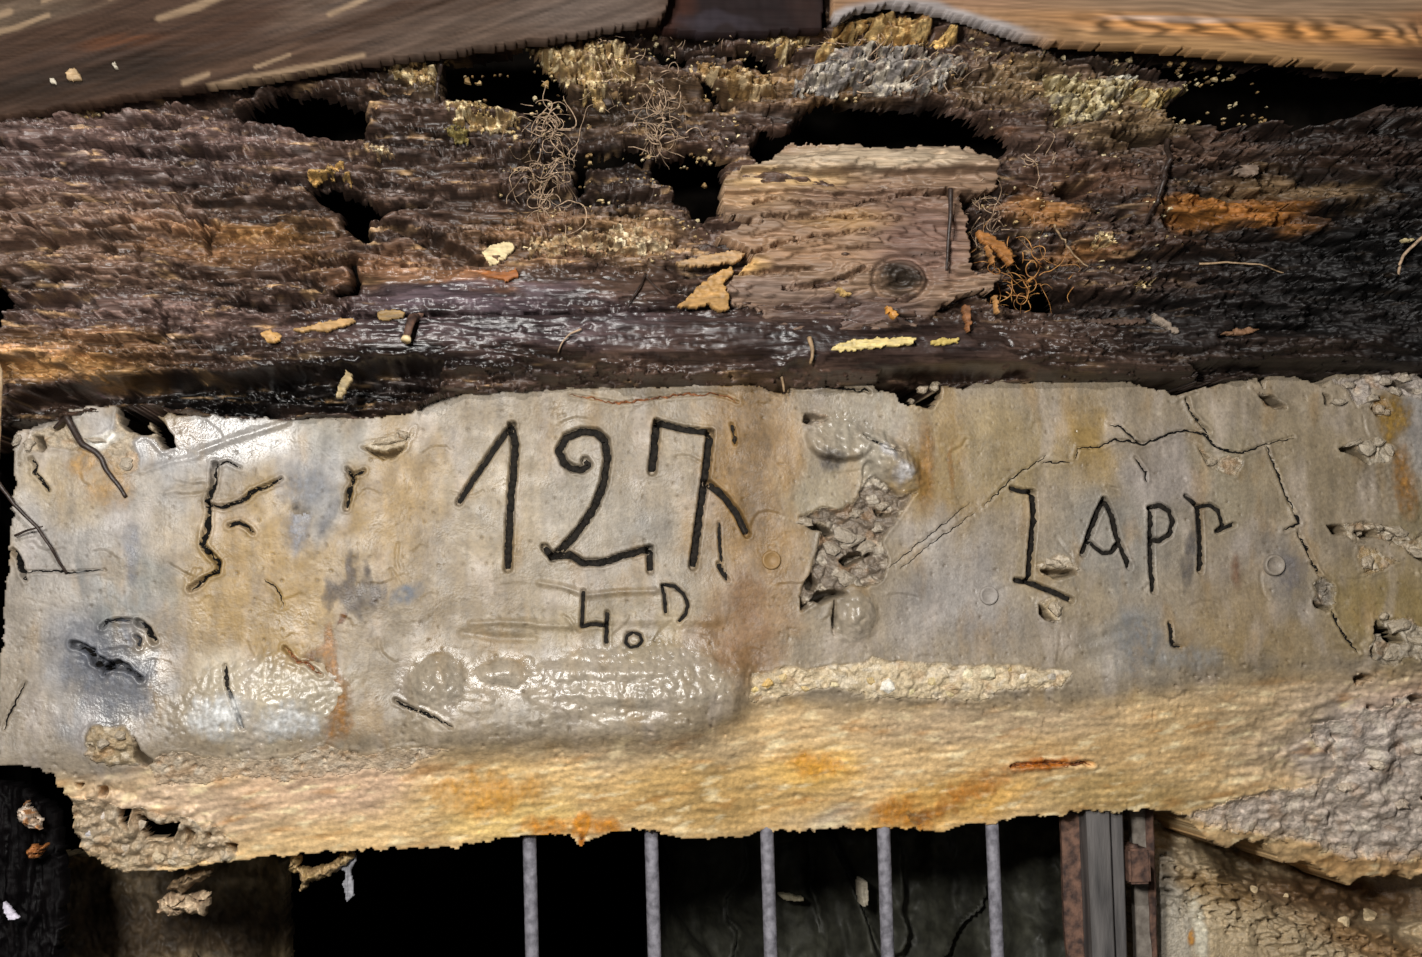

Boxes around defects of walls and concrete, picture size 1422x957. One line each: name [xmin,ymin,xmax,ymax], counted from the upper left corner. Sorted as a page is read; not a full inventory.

crack [889,400,1318,573]
spalling [796,477,918,612]
spalling [1329,521,1422,576]
crack [1331,609,1357,652]
spalling [1369,612,1422,666]
rust [877,777,994,830]
rust [1010,758,1068,771]
spalling [1181,693,1422,865]
spalling [67,794,239,872]